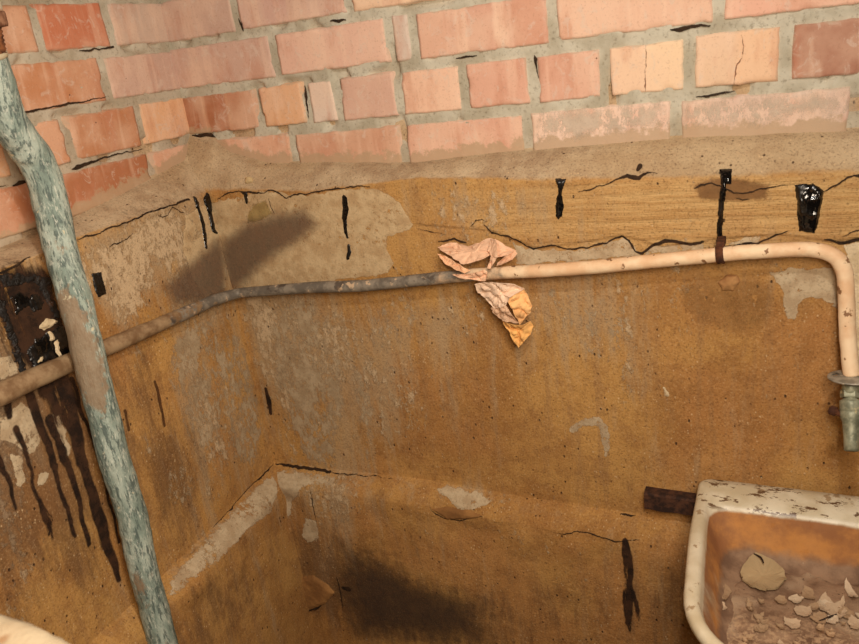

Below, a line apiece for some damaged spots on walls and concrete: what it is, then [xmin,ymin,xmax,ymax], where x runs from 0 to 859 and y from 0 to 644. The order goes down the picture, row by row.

crack [579,163,655,192]
crack [78,198,190,247]
peeling [182,187,413,289]
crack [420,219,704,255]
crack [725,231,787,247]
crack [824,230,859,245]
peeling [770,267,838,319]
peeling [844,242,859,358]
peeling [0,355,17,379]
peeling [0,402,40,487]
peeling [54,415,71,456]
leakage [622,538,640,632]